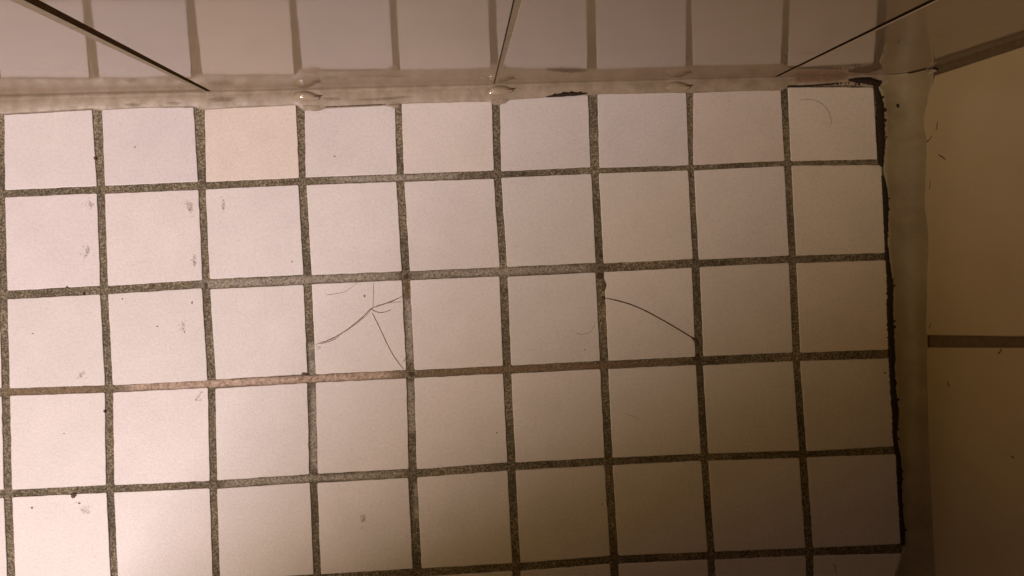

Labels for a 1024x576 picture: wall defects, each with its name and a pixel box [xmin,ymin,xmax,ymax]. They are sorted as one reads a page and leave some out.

crack [315,295,405,371]
crack [605,298,696,340]